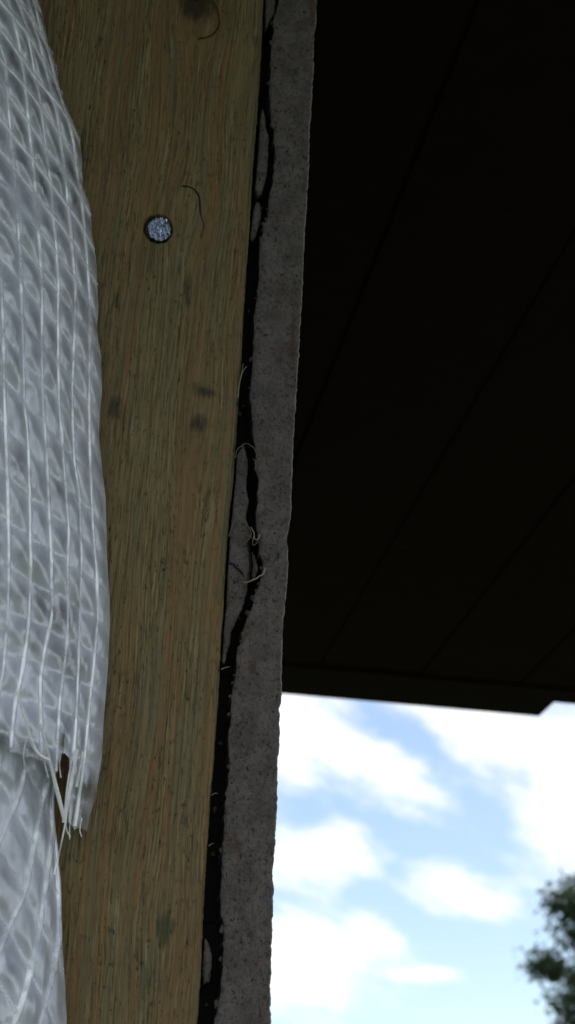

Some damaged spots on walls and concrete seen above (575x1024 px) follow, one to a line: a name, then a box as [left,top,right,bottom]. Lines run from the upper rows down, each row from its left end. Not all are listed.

crack [247,0,279,258]
crack [219,445,263,676]
crack [197,918,224,1024]